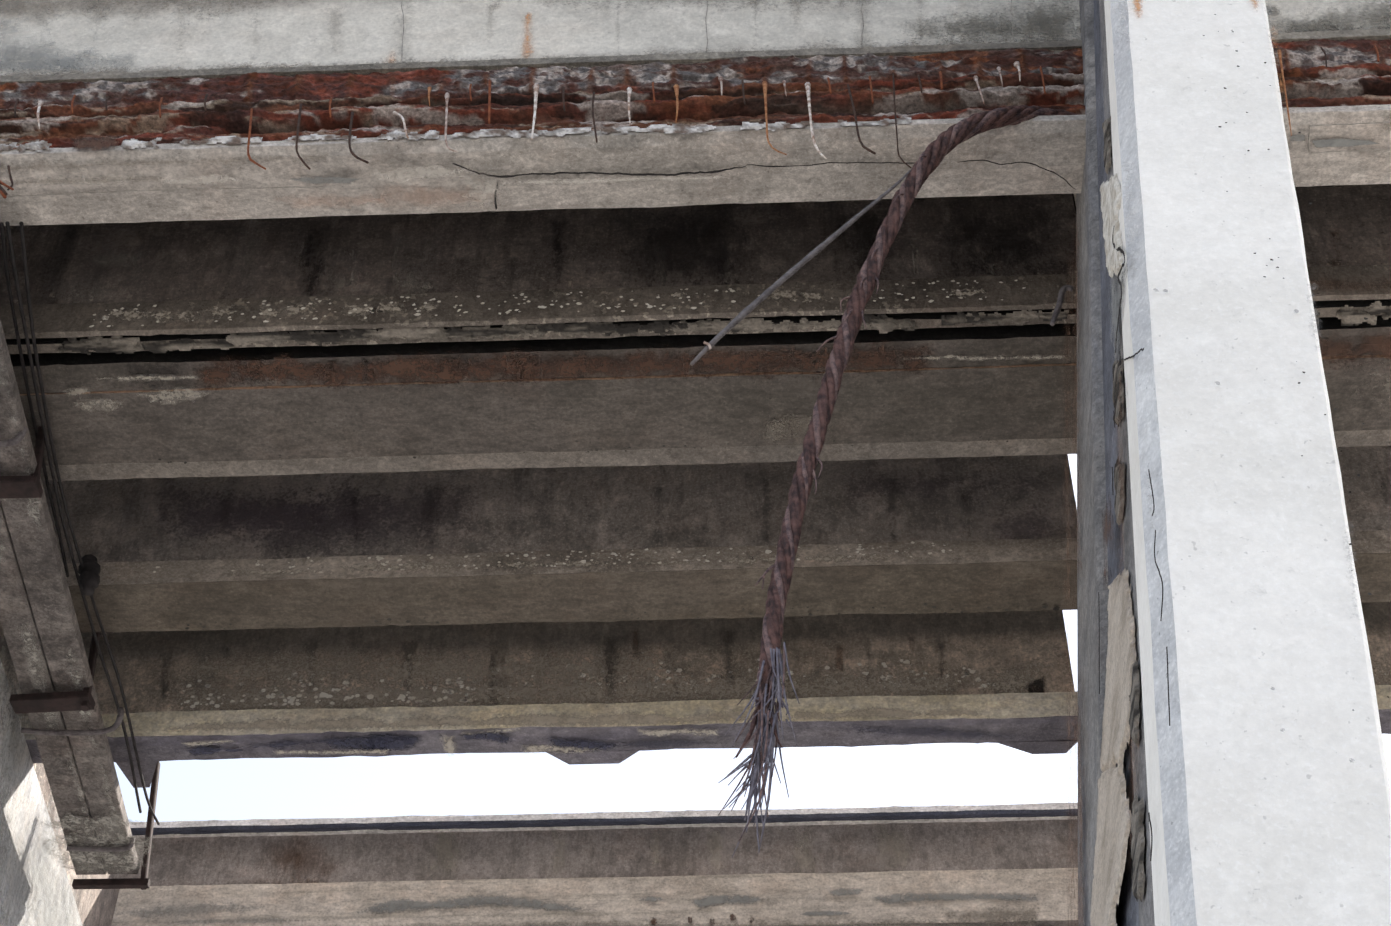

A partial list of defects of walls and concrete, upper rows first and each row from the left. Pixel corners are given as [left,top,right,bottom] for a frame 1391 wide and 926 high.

spalling [0,48,1085,170]
spalling [1264,39,1391,136]
spalling [977,659,1054,694]
spalling [1090,568,1145,926]
peeling [42,753,152,874]